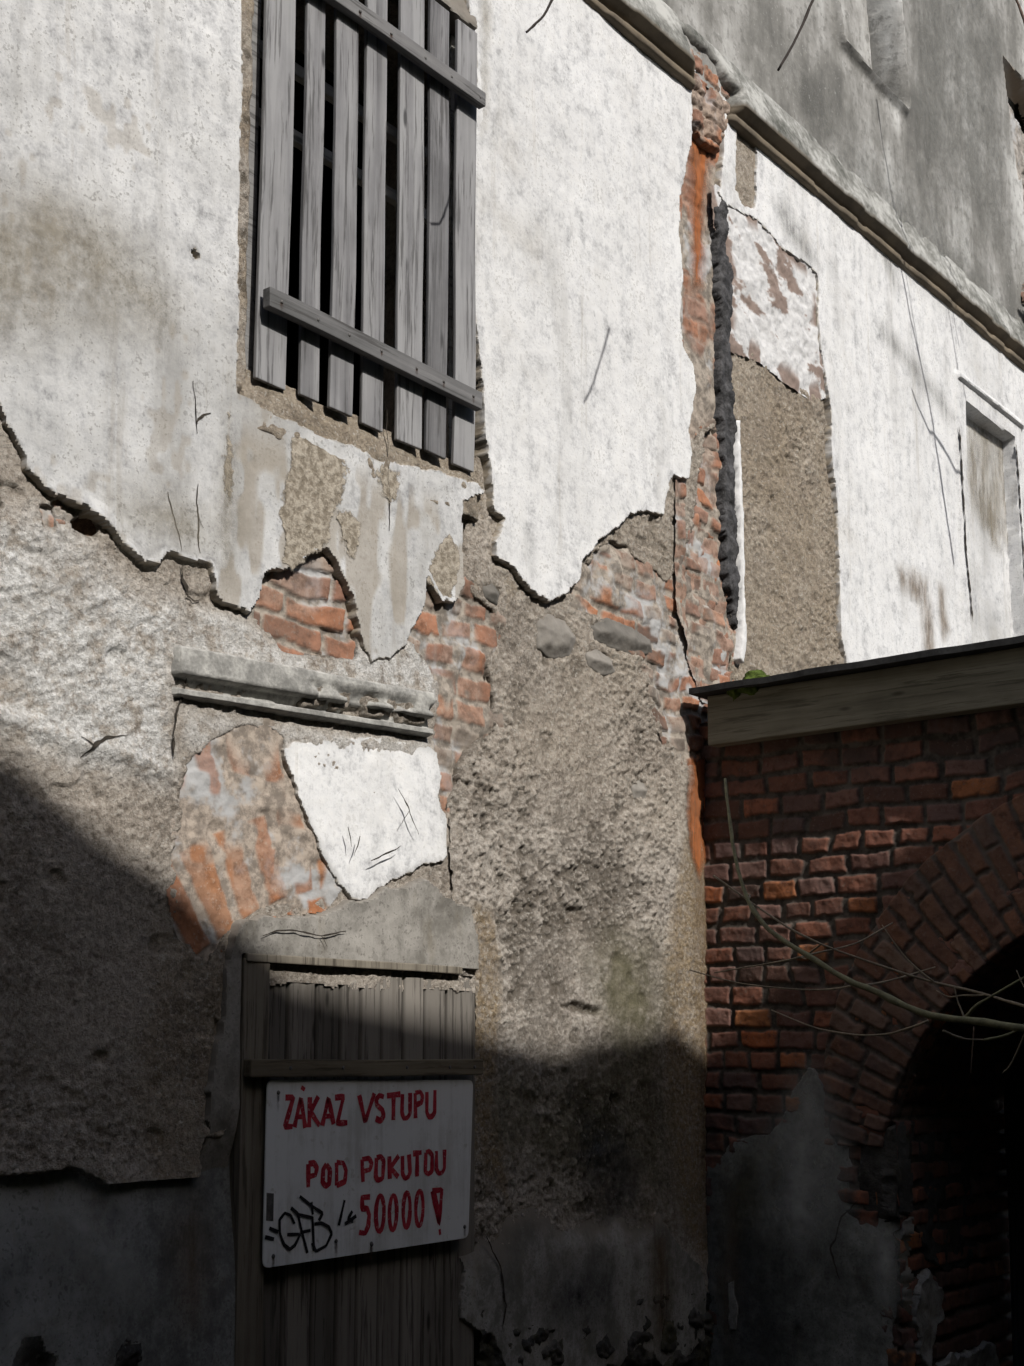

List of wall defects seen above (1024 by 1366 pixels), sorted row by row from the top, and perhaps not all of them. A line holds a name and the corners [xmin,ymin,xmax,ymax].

flaking render [0,49,844,1366]
flaking render [907,1268,1000,1366]